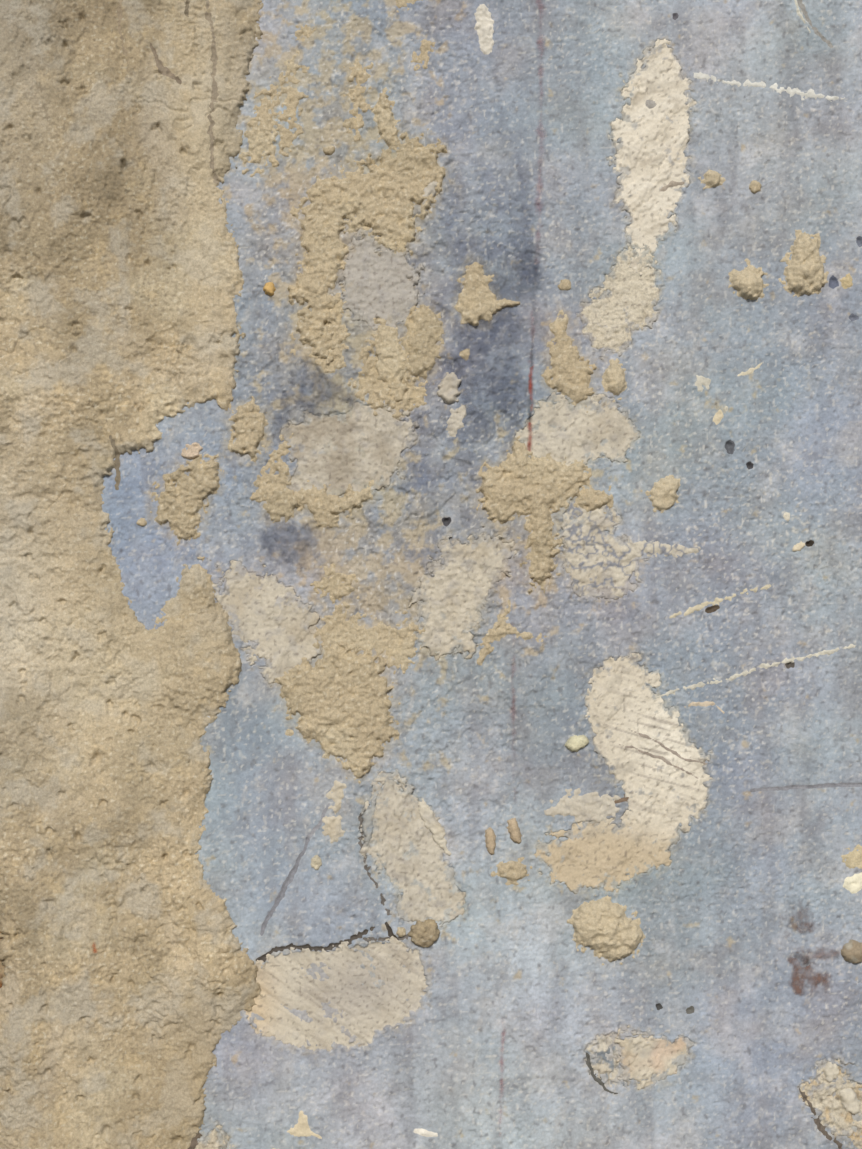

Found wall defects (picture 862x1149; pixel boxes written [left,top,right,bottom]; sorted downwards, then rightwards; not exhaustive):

peeling [725,440,735,454]
flaking render [0,0,428,1149]
crack [256,803,409,962]
peeling [360,767,466,927]